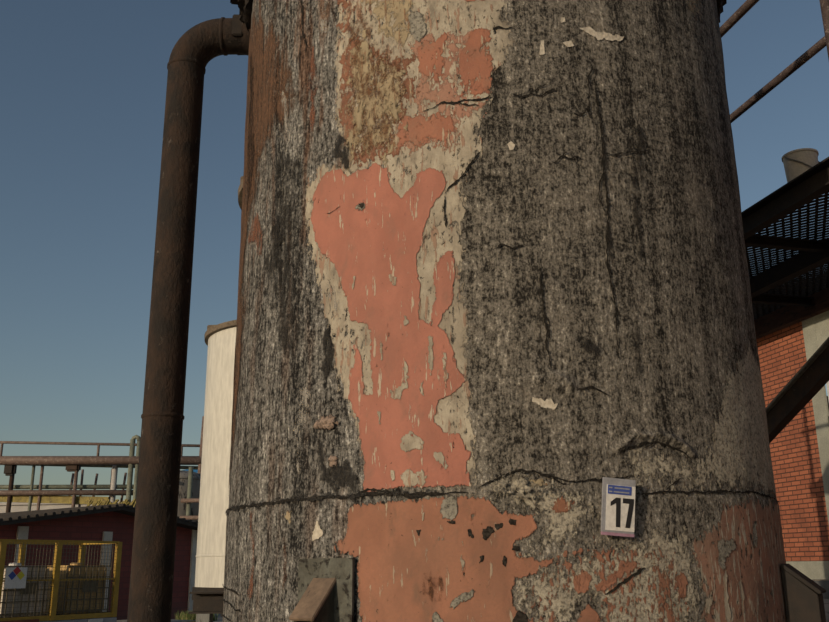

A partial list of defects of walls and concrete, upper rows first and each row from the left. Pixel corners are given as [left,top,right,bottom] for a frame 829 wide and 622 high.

crack [424,96,489,111]
crack [511,84,562,97]
crack [443,151,481,226]
crack [552,64,648,353]
crack [539,266,551,367]
peeling [305,0,787,622]
crack [627,440,690,458]
crack [226,469,780,513]